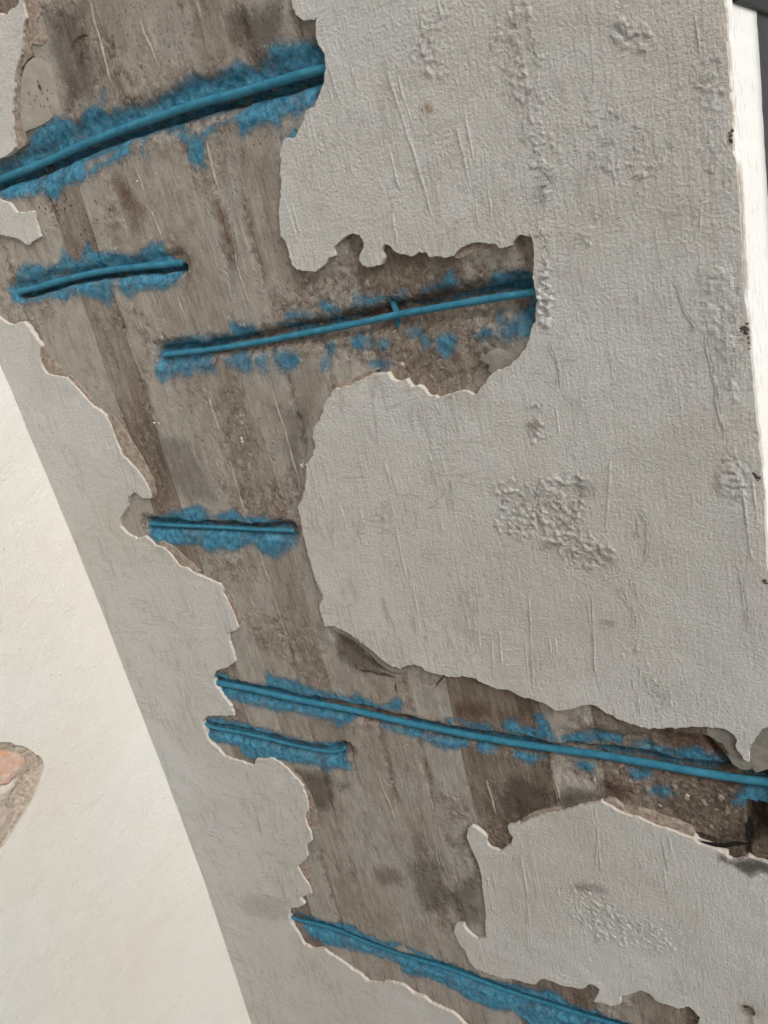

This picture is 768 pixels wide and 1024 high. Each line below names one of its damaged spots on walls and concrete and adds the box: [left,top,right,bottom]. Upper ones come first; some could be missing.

spalling [0,0,325,171]
spalling [721,1,732,69]
spalling [0,63,768,786]
flaking render [0,742,41,846]
spalling [206,697,768,1024]